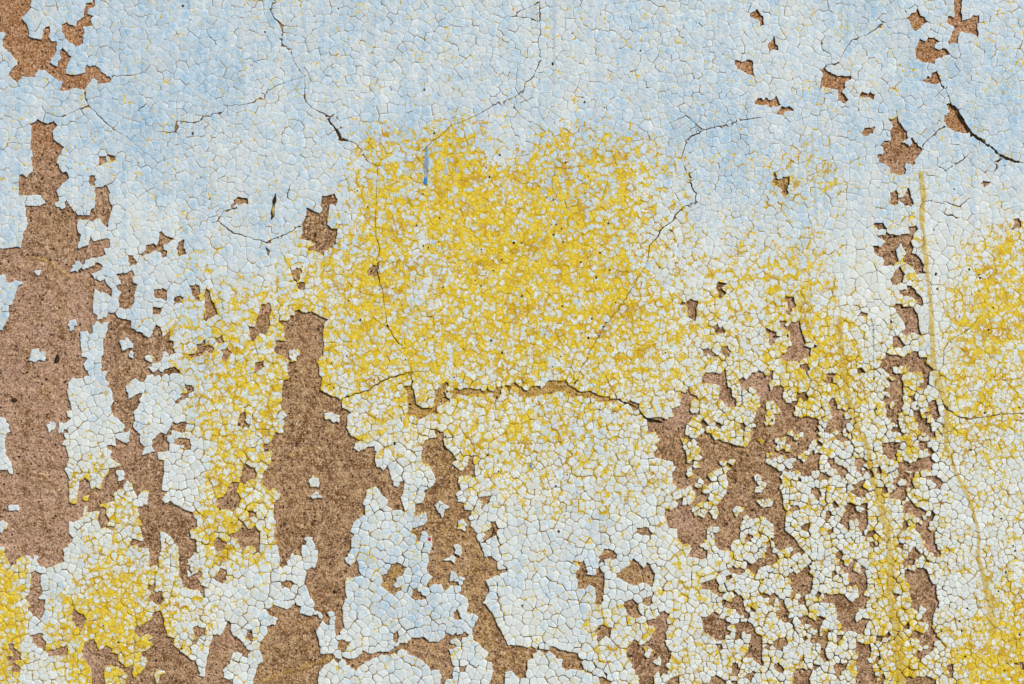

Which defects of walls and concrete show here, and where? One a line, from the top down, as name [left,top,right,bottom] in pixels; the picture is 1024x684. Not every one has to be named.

peeling [0,0,111,93]
crack [428,0,545,146]
peeling [755,91,793,115]
peeling [820,65,851,104]
peeling [905,0,987,90]
peeling [939,103,976,137]
crack [908,84,1021,171]
crack [160,3,401,345]
crack [573,116,755,384]
crack [341,372,412,400]
peeling [0,117,960,684]
crack [616,399,664,423]